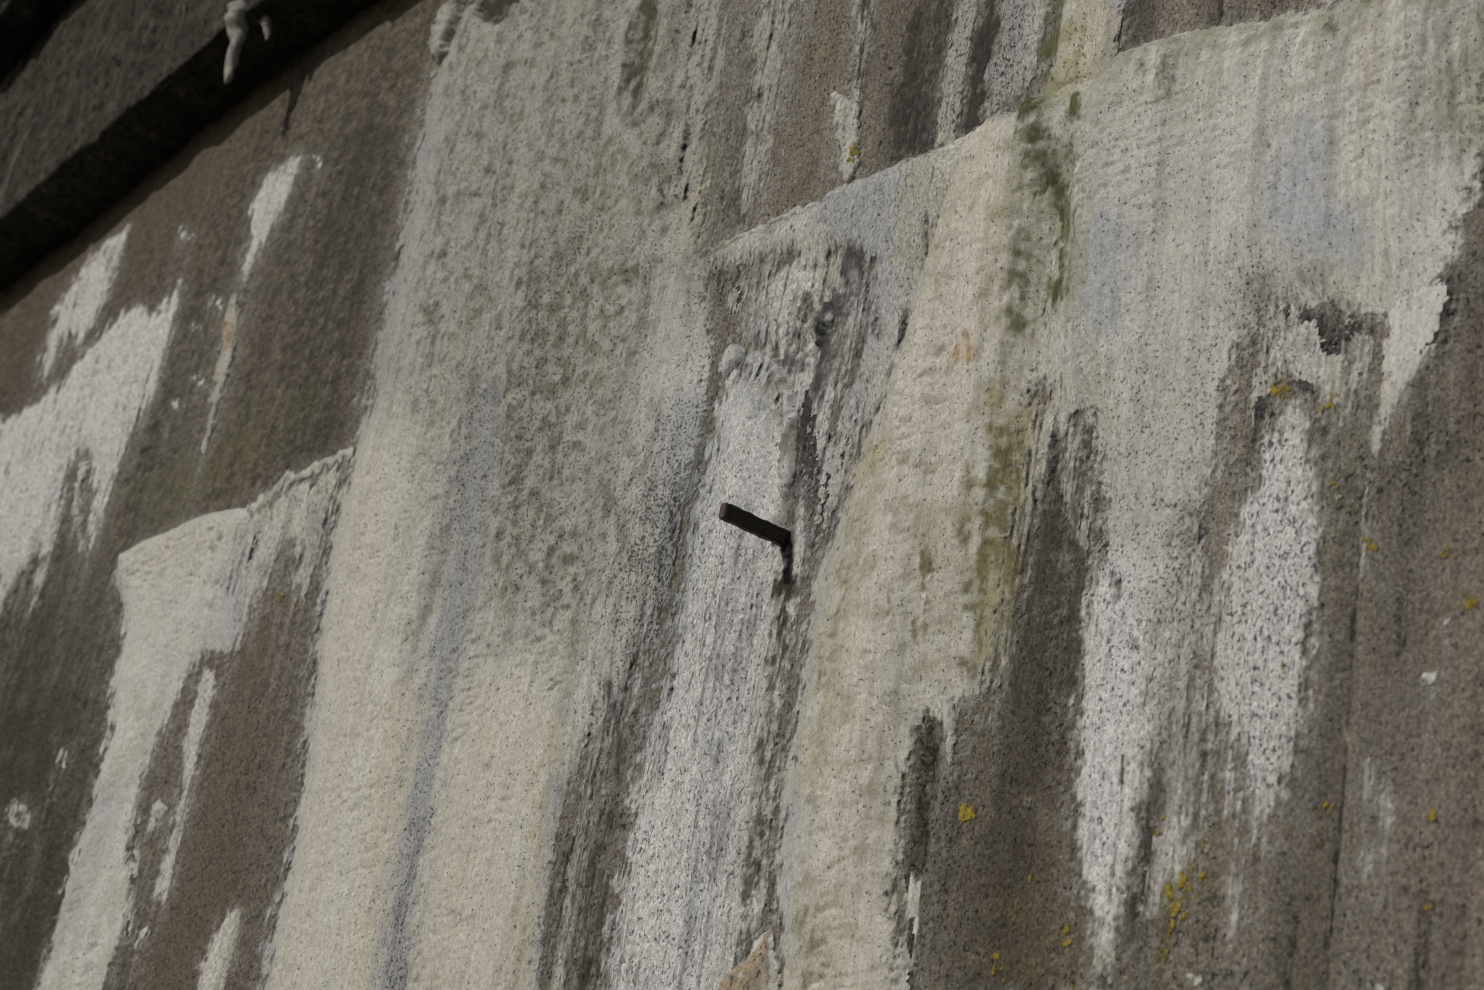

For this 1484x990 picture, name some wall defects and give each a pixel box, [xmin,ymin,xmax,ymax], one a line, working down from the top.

damp [0,223,183,615]
damp [201,155,305,456]
damp [771,245,863,502]
damp [1001,443,1088,705]
damp [1359,473,1371,580]
damp [122,668,221,937]
damp [197,908,241,990]
damp [741,552,793,918]
damp [893,873,922,990]
damp [940,695,956,764]
damp [1118,632,1253,953]
damp [1351,758,1396,881]